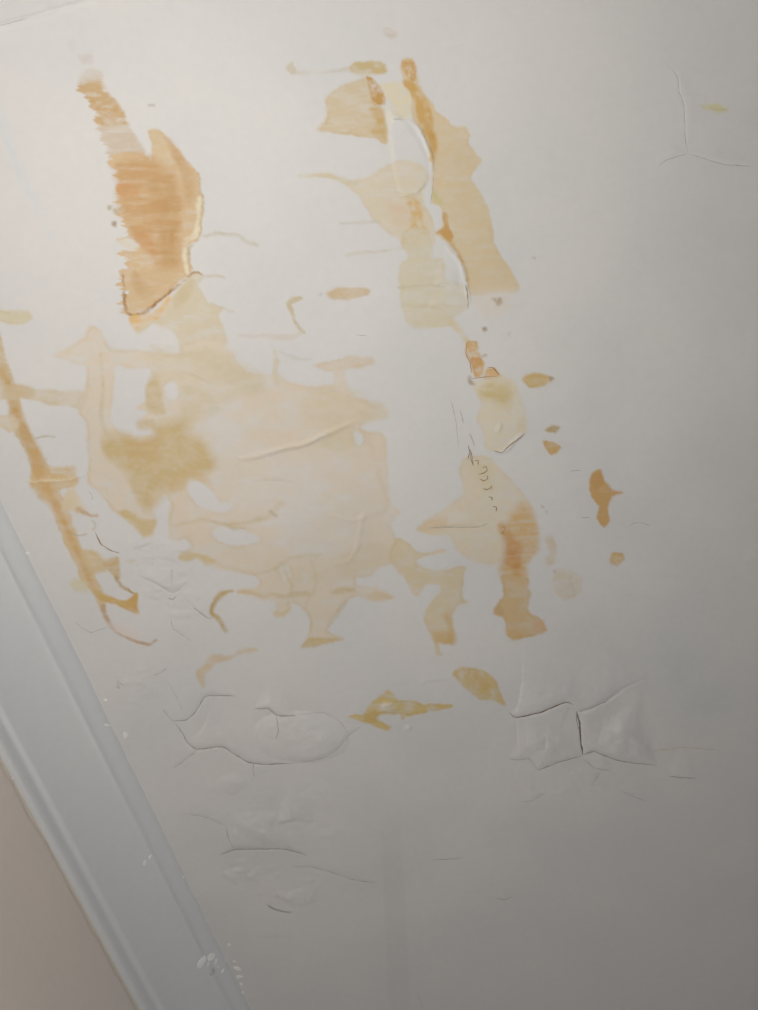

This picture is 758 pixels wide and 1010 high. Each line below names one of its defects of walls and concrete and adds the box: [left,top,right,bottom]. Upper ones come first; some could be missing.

leakage [285,56,523,333]
leakage [0,37,470,656]
leakage [520,370,556,390]
leakage [541,423,563,457]
leakage [587,468,625,529]
leakage [608,551,626,567]
leakage [451,665,508,708]